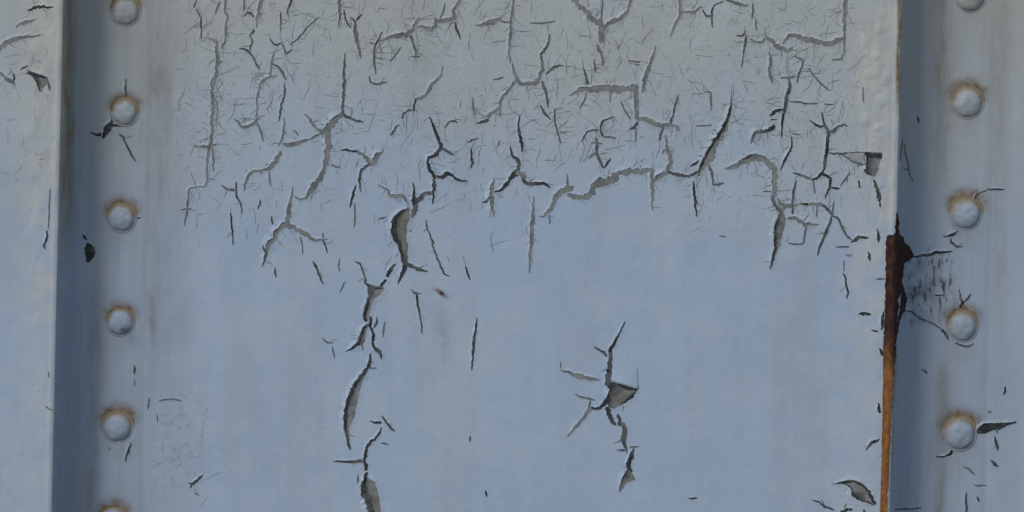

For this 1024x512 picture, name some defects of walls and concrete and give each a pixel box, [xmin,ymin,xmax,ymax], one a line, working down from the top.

peeling [20,65,55,92]
crack [0,0,52,250]
peeling [90,118,136,161]
peeling [842,149,886,188]
peeling [81,234,99,263]
crack [174,0,884,512]
rust [880,212,914,512]
peeling [976,411,1017,467]
peeling [812,474,877,512]